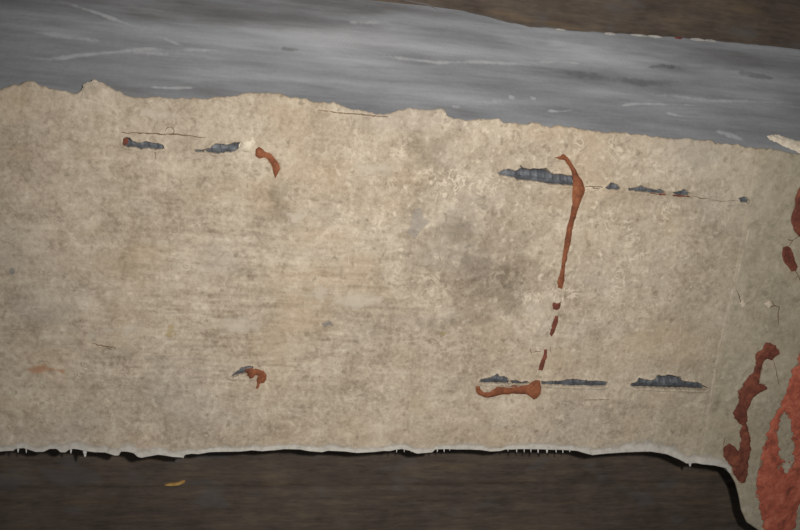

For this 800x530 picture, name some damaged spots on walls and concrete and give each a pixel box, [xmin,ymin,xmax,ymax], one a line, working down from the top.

spalling [119,133,169,154]
spalling [189,139,244,158]
rust [255,147,280,178]
spalling [495,162,573,190]
rust [555,154,585,289]
rust [791,188,800,237]
rust [782,246,798,271]
rust [245,368,266,389]
rust [476,380,541,400]
spalling [475,371,611,391]
spalling [627,372,711,394]
rust [723,342,800,530]